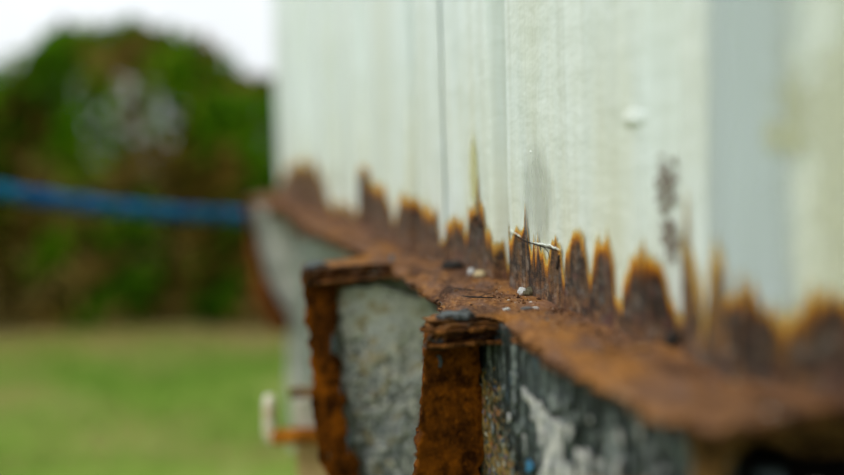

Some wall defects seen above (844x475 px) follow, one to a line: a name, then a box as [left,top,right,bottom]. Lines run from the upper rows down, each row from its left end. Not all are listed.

rust [279,149,844,394]
peeling [331,284,440,475]
peeling [502,371,670,475]